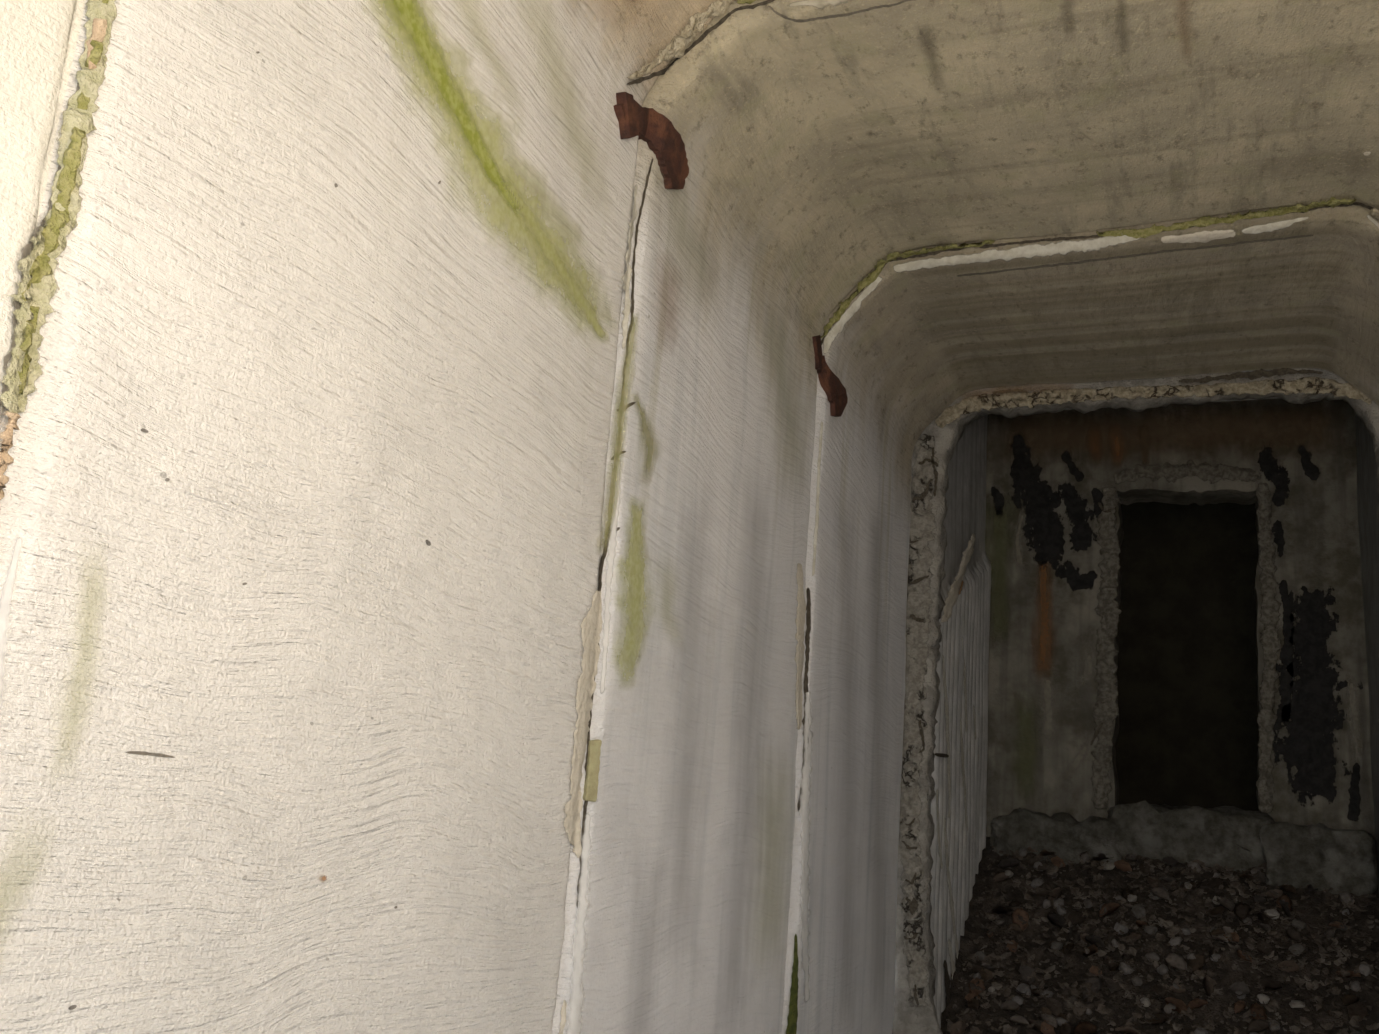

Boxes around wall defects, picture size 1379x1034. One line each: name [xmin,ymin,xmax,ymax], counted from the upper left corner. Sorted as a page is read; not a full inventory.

leakage [392,0,605,337]